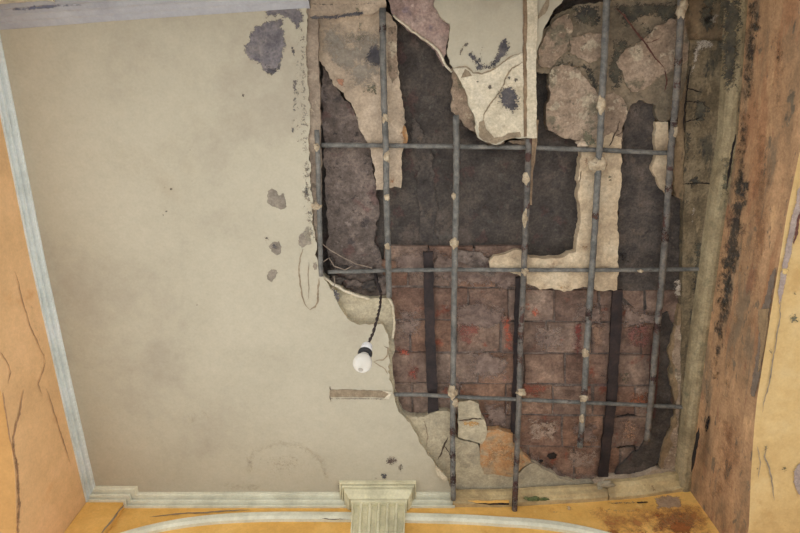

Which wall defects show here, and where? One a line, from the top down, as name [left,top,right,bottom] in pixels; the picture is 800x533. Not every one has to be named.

water stain [244,3,380,94]
water stain [690,0,759,98]
crack [298,250,320,310]
spalling [291,0,725,489]
water stain [672,243,702,296]
water stain [714,115,750,362]
crack [763,300,782,405]
crack [0,273,71,533]
water stain [603,509,705,532]
crack [757,447,775,501]